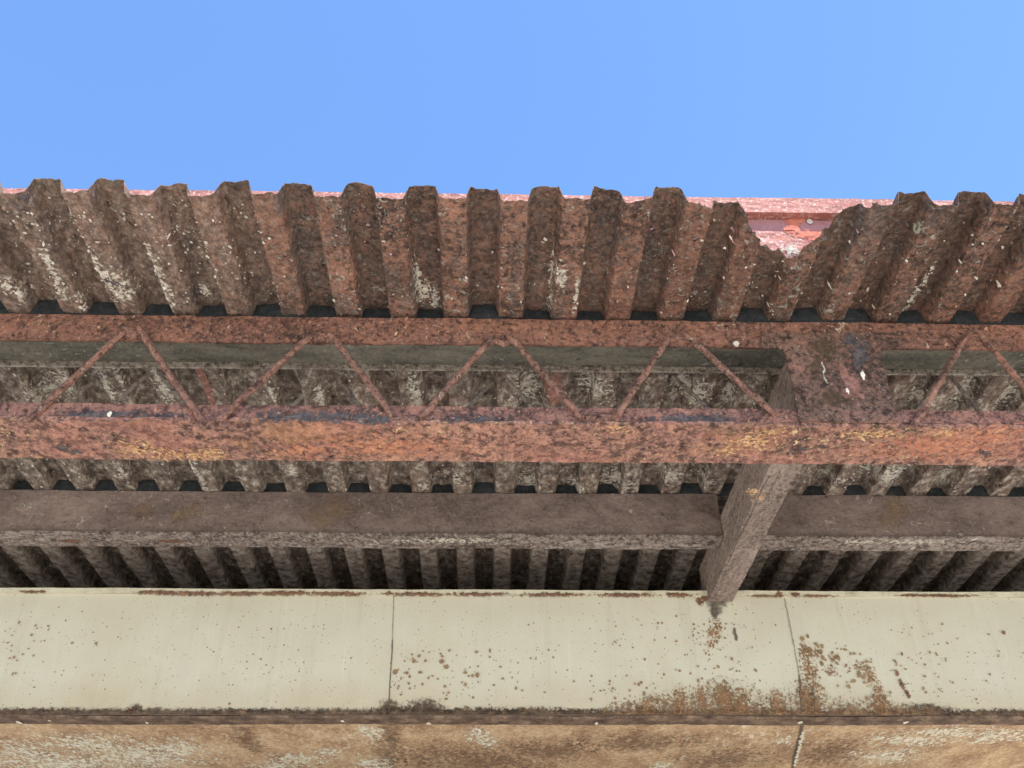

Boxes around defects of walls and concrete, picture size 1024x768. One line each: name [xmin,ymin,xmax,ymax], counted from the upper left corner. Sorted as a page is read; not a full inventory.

peeling [781,219,821,257]
rust [54,443,83,455]
rust [109,439,228,462]
rust [265,432,478,461]
rust [710,424,809,457]
rust [832,421,1024,464]
rust [390,645,559,708]
rust [566,613,979,715]